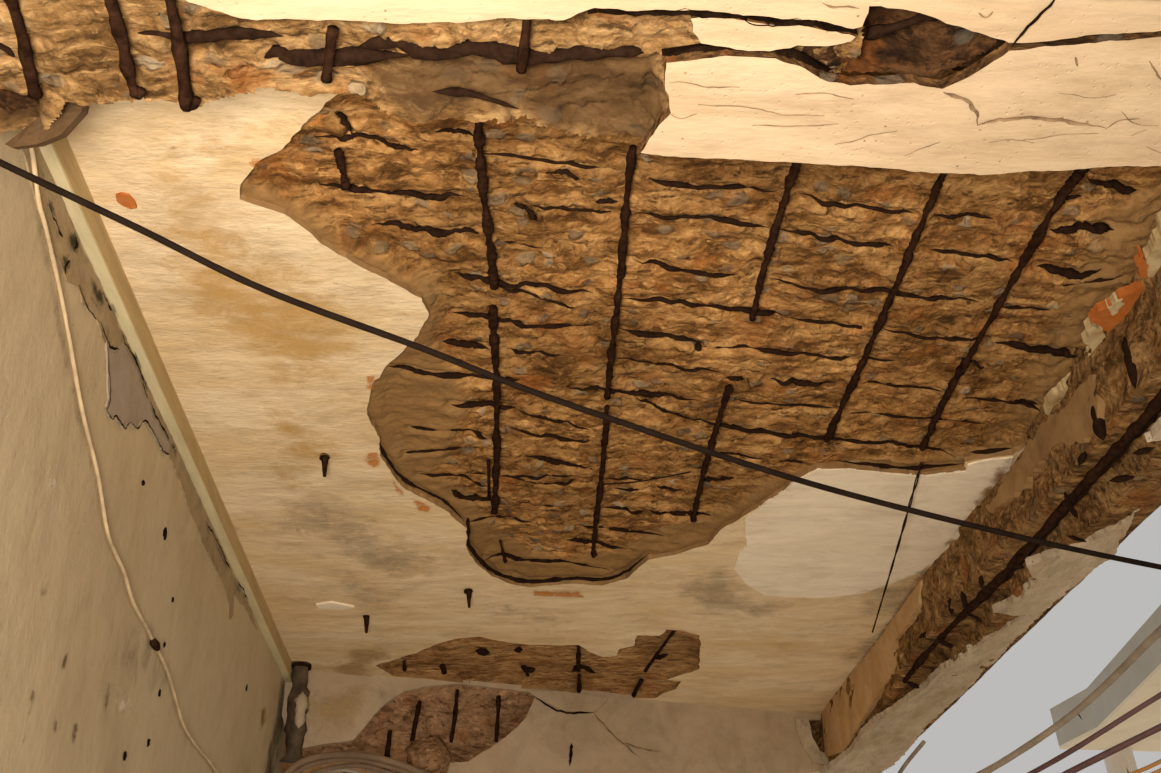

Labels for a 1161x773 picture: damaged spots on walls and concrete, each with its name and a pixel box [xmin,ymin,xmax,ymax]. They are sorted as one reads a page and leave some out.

crack [978,0,1055,50]
crack [943,57,1161,153]
spalling [0,0,1161,584]
spalling [902,389,1161,689]
spalling [293,630,700,773]
crack [567,743,575,766]
crack [534,696,661,757]